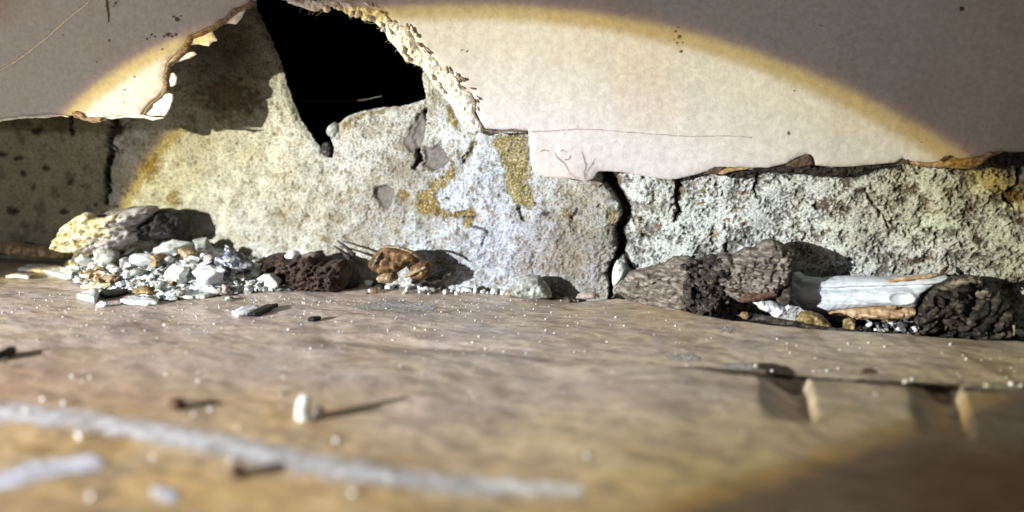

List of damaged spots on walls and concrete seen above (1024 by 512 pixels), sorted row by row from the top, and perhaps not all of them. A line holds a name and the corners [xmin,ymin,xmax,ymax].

spalling [256,0,482,171]
flaking render [120,284,221,306]
spalling [374,186,394,211]
crack [462,129,636,300]